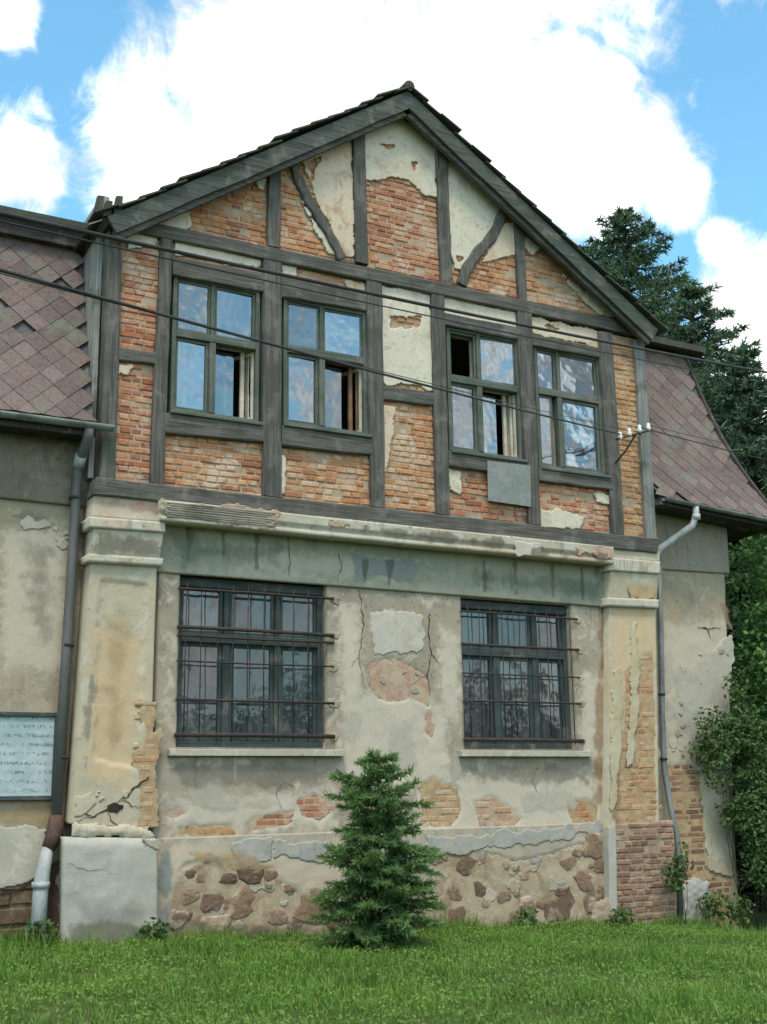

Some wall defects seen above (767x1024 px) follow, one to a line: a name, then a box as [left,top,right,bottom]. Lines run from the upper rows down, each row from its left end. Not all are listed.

spalling [161,498,281,530]
crack [351,590,365,686]
crack [412,614,438,690]
spalling [367,659,436,737]
crack [76,777,149,825]
spalling [74,698,334,850]
spalling [416,621,735,928]
spalling [168,856,357,938]